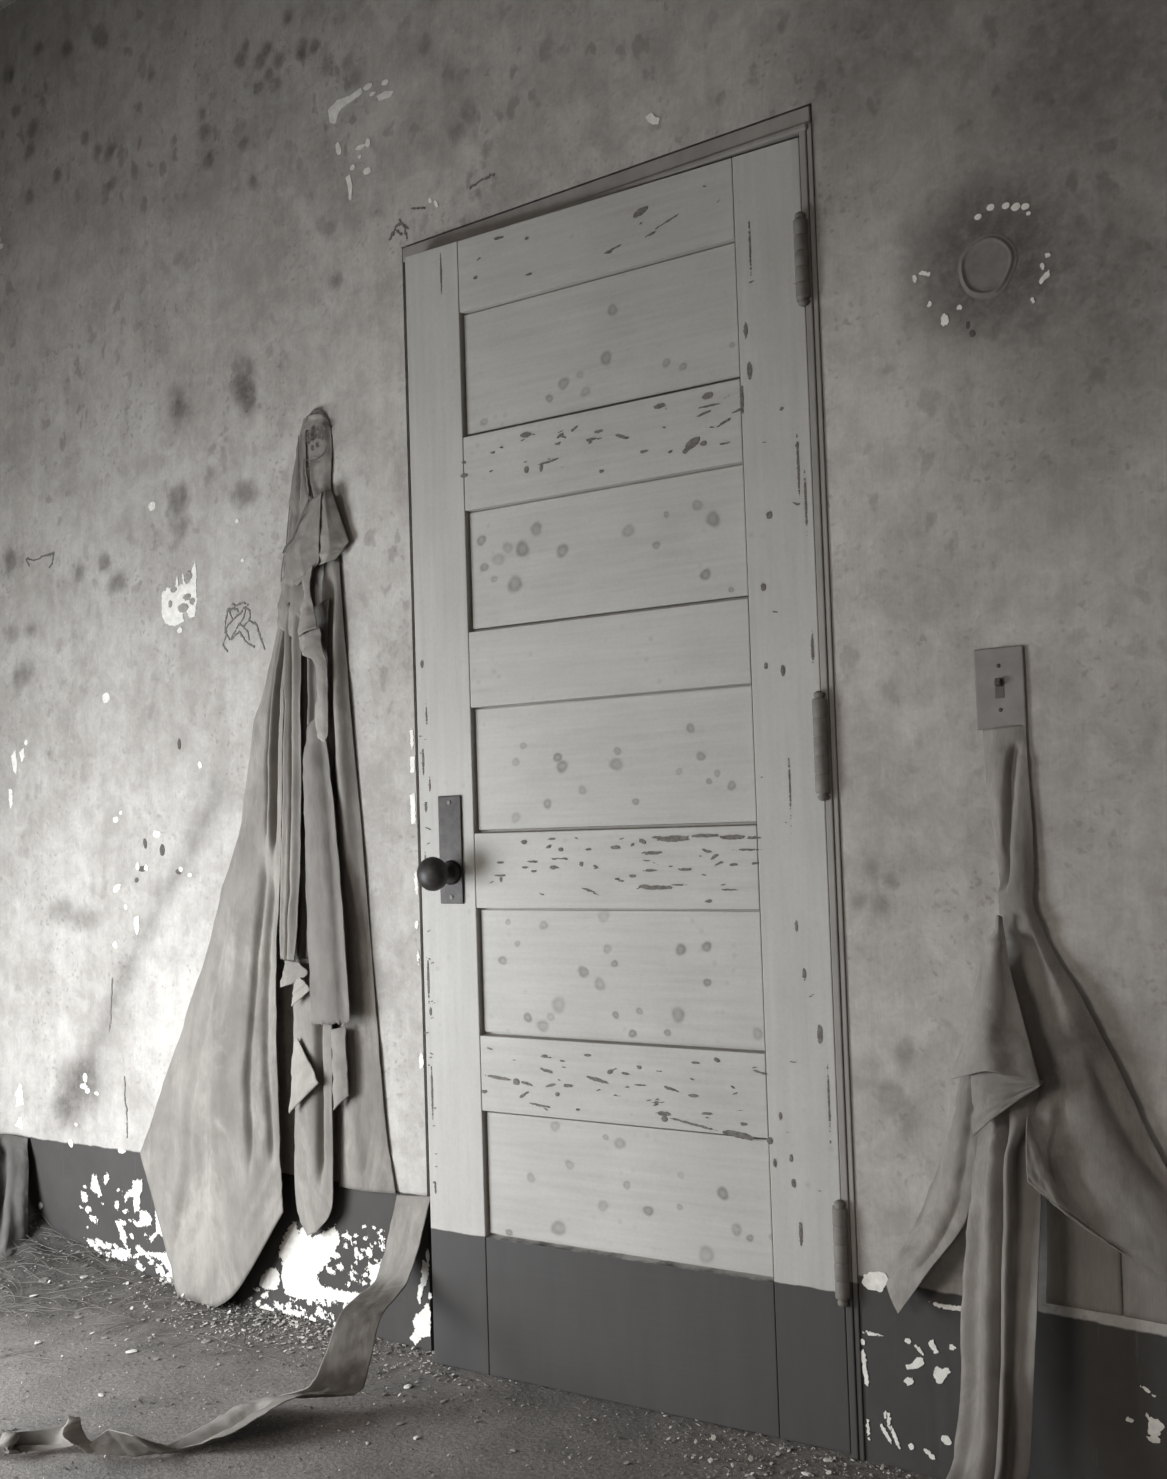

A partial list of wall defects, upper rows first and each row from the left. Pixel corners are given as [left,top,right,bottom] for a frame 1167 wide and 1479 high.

peeling [328,79,394,124]
peeling [335,138,371,201]
peeling [161,561,198,633]
peeling [79,1172,174,1285]
peeling [248,1221,385,1326]
peeling [410,1249,432,1345]
peeling [862,1271,888,1292]
peeling [929,1301,961,1311]
peeling [861,1330,883,1386]
peeling [904,1338,956,1386]
peeling [865,1411,952,1460]
peeling [1126,1385,1165,1443]